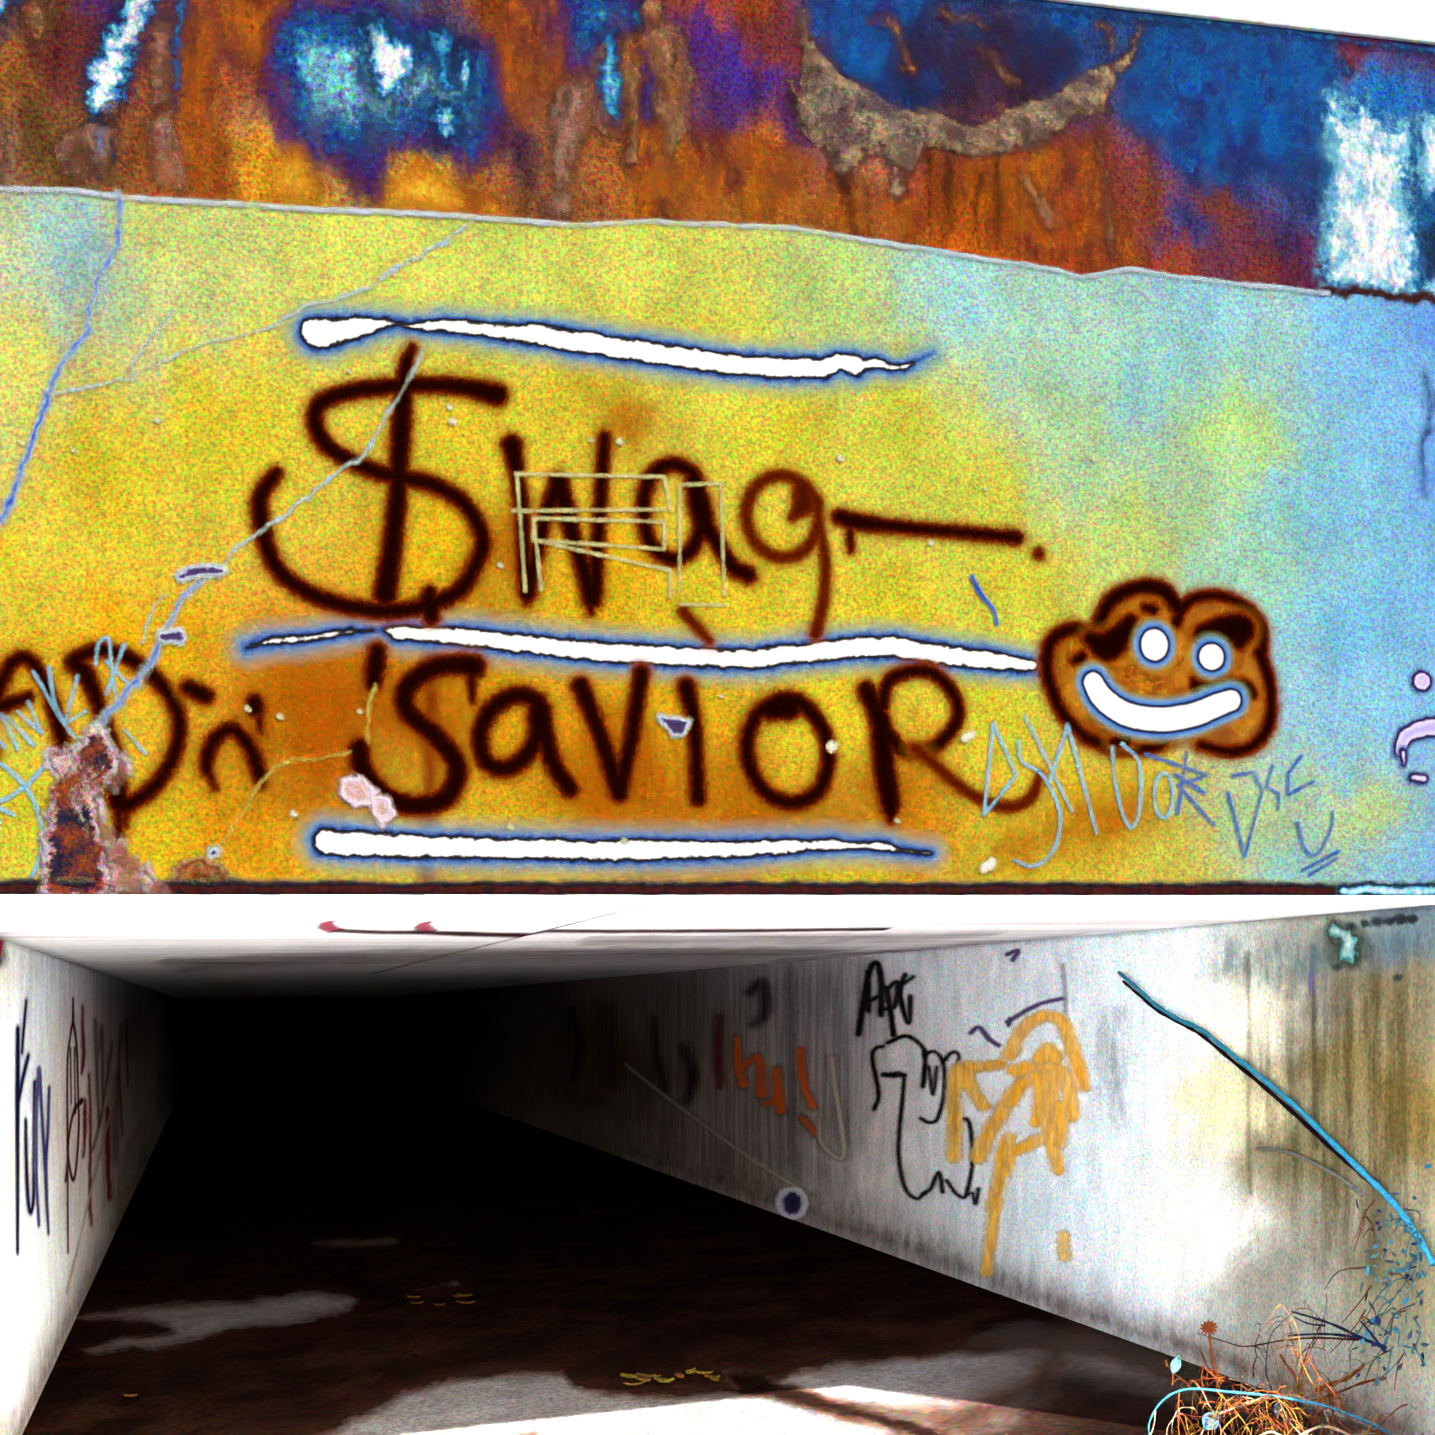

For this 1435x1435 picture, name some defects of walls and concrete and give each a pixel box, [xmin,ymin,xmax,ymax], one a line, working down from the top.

corrosion [216,0,283,65]
corrosion [499,0,563,114]
corrosion [272,147,319,204]
corrosion [383,160,510,217]
corrosion [814,167,869,236]
corrosion [886,143,1142,268]
crack [0,191,467,525]
crack [1421,373,1435,495]
crack [99,349,424,728]
spalling [37,715,238,895]
crack [219,686,376,845]
water stain [1287,914,1418,1256]